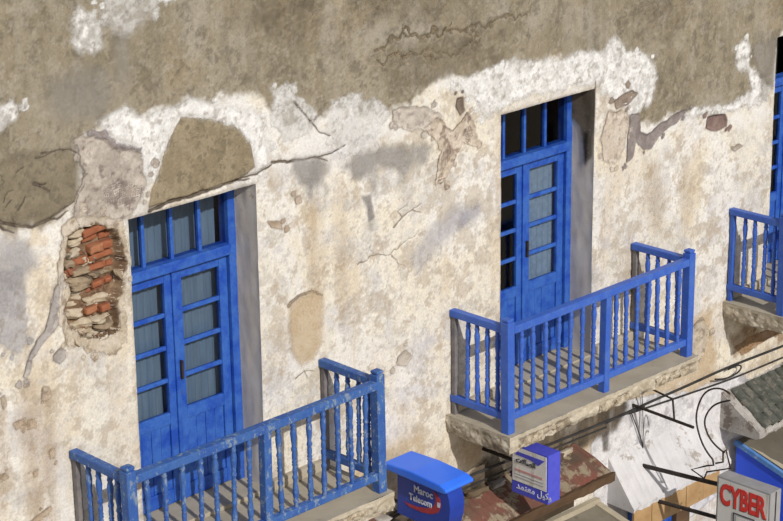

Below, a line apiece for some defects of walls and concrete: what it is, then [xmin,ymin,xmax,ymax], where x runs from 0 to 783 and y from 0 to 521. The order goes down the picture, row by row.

flaking render [0,83,322,389]
crack [148,102,345,213]
peeling [326,33,772,190]
flaking render [41,386,52,404]